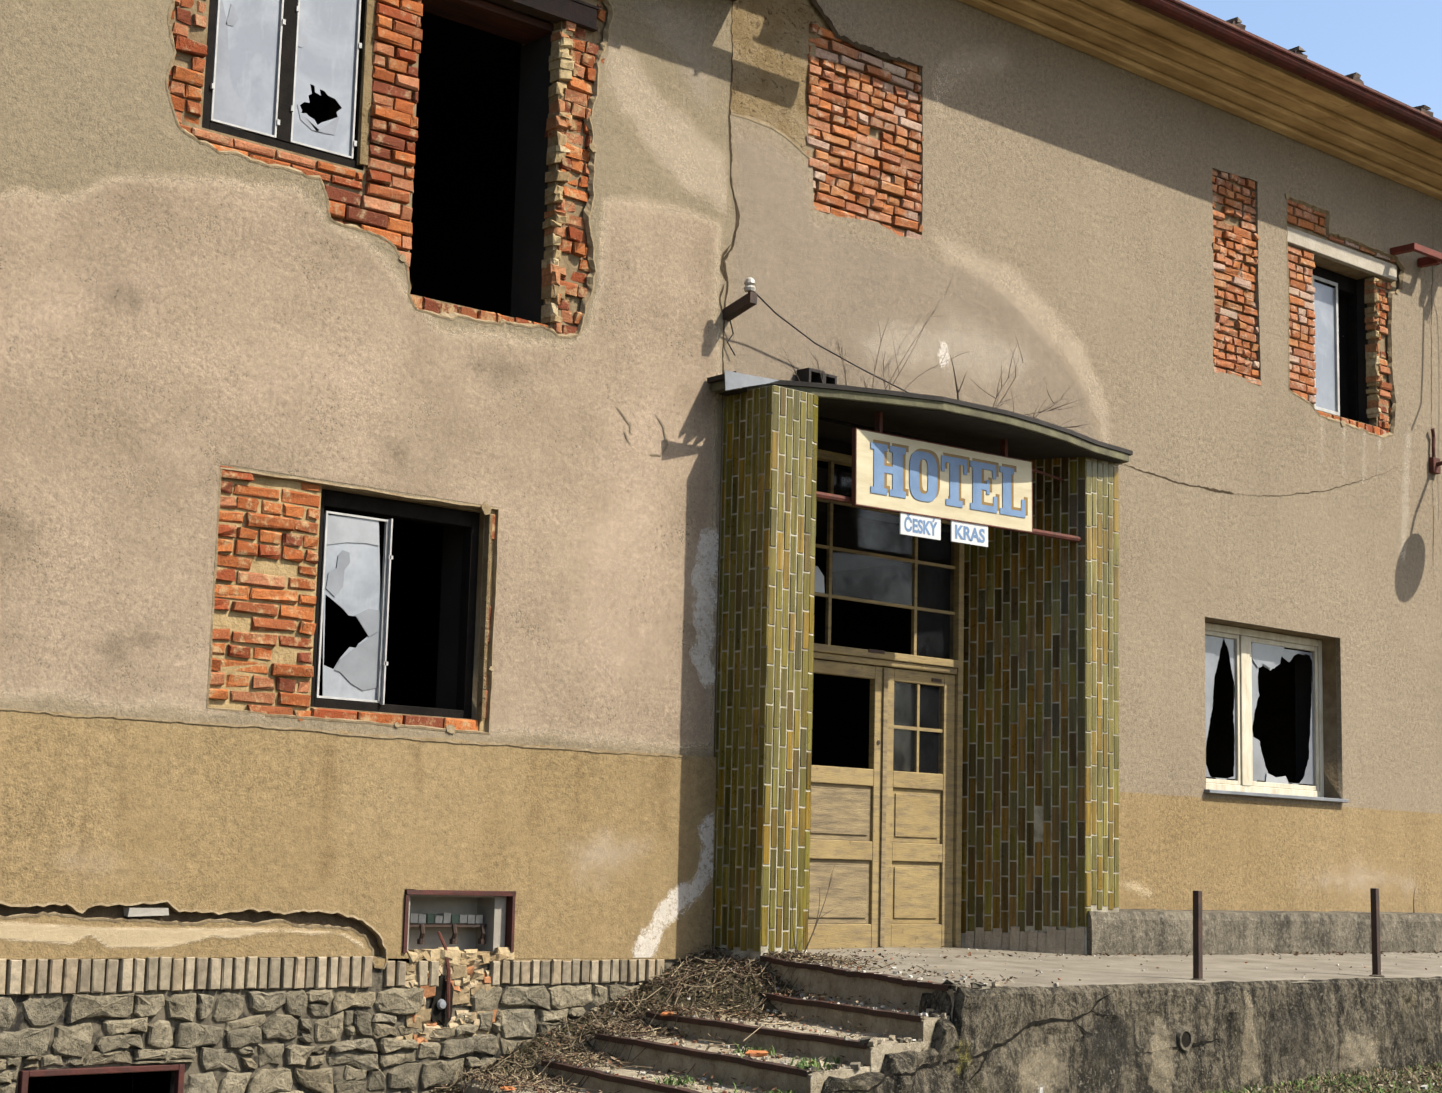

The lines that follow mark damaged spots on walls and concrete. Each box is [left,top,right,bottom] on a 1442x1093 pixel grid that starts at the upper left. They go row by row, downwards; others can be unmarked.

spalling [730,0,923,158]
spalling [165,0,614,338]
crack [719,1,740,372]
spalling [1285,193,1405,439]
damp [0,45,1110,748]
crack [1122,464,1398,496]
spalling [207,467,499,734]
flaking render [0,922,363,948]
spalling [396,947,514,1047]
damp [633,815,714,958]
crack [823,993,1118,1093]